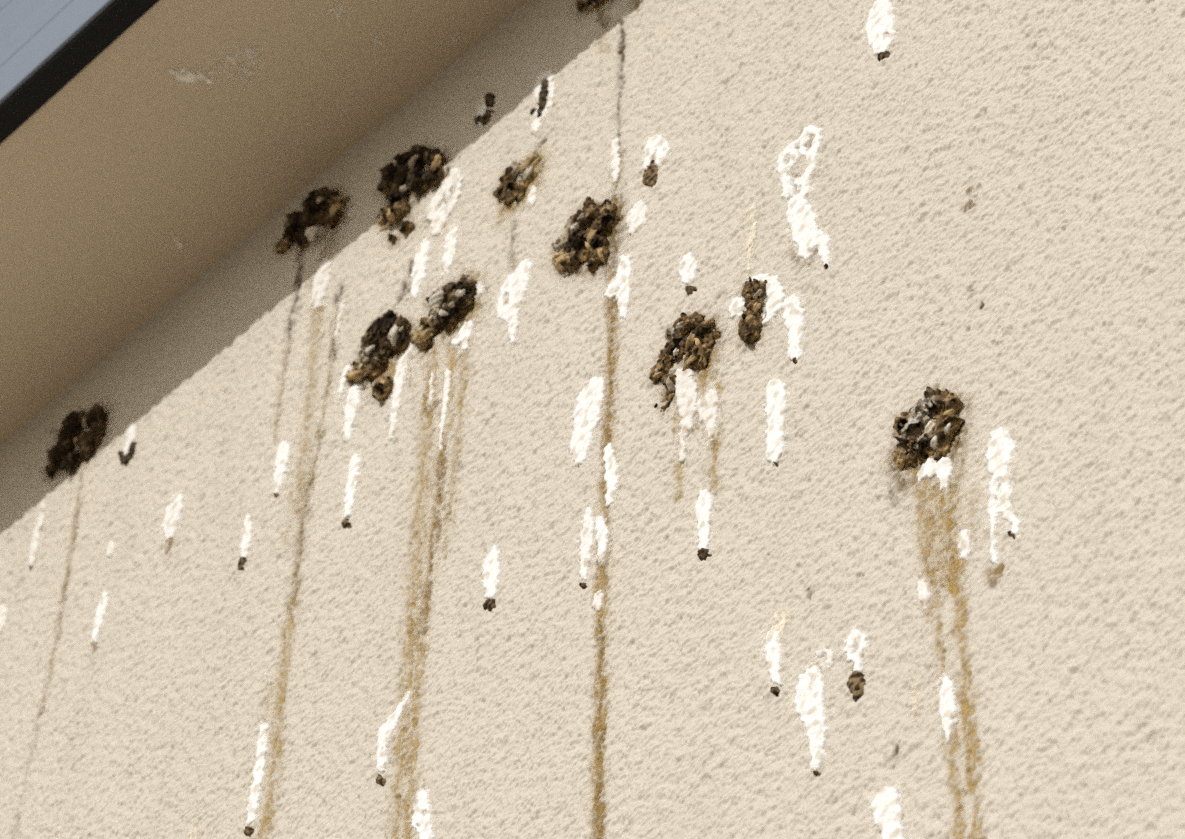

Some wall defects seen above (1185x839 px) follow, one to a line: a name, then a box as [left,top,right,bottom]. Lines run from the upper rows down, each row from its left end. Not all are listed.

leakage [598,3,625,79]
leakage [287,248,304,337]
leakage [601,296,619,528]
leakage [259,731,281,838]
leakage [277,445,317,716]
leakage [393,349,467,839]
leakage [592,546,608,839]
leakage [897,469,985,839]